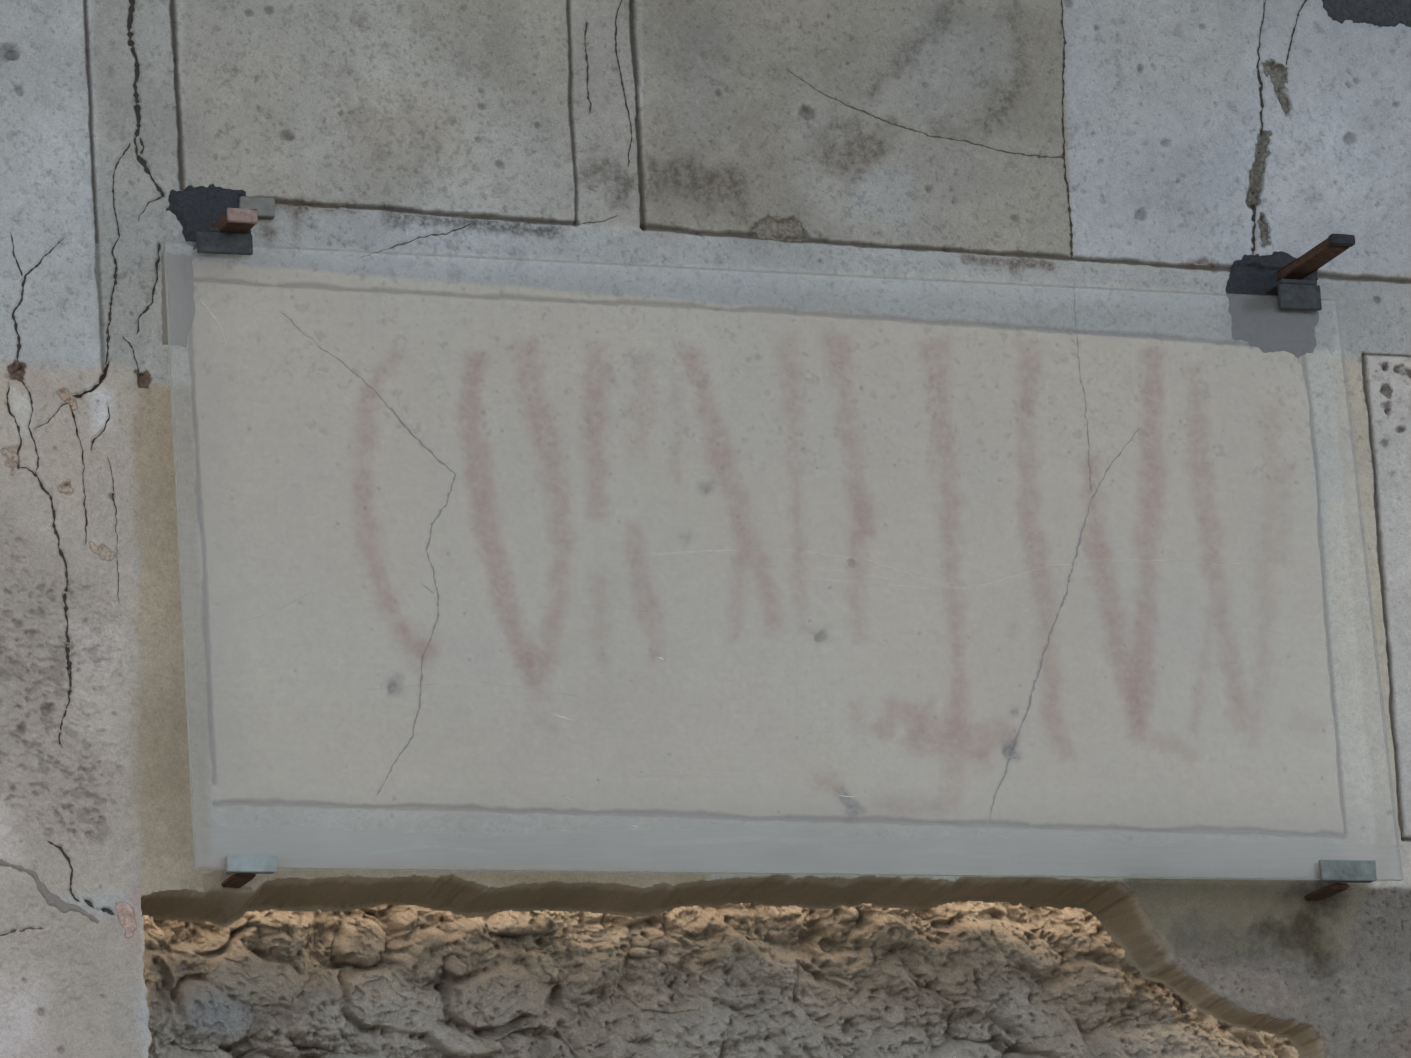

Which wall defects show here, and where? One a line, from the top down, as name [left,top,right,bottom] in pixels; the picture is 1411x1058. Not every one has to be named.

crack [1250,0,1307,254]
crack [6,0,164,747]
crack [281,313,456,797]
crack [790,0,1139,818]
crack [0,841,115,936]